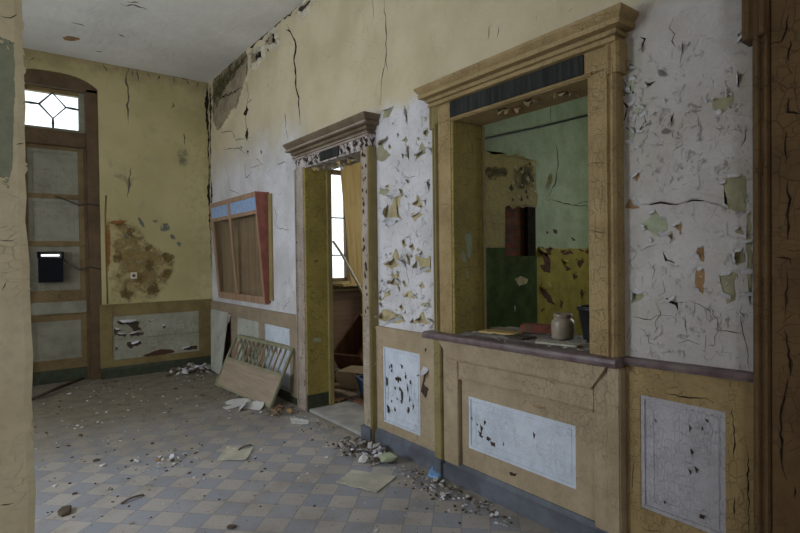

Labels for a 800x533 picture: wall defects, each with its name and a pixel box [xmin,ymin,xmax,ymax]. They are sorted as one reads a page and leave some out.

peeling [0,37,26,188]
crack [97,7,300,266]
flaking render [210,27,280,135]
crack [372,1,388,102]
crack [769,15,792,61]
water stain [113,223,175,299]
peeling [365,240,434,328]
peeling [386,364,429,413]
flaking render [481,150,538,248]
crack [627,244,750,369]
peeling [717,174,753,304]
crack [778,182,800,497]